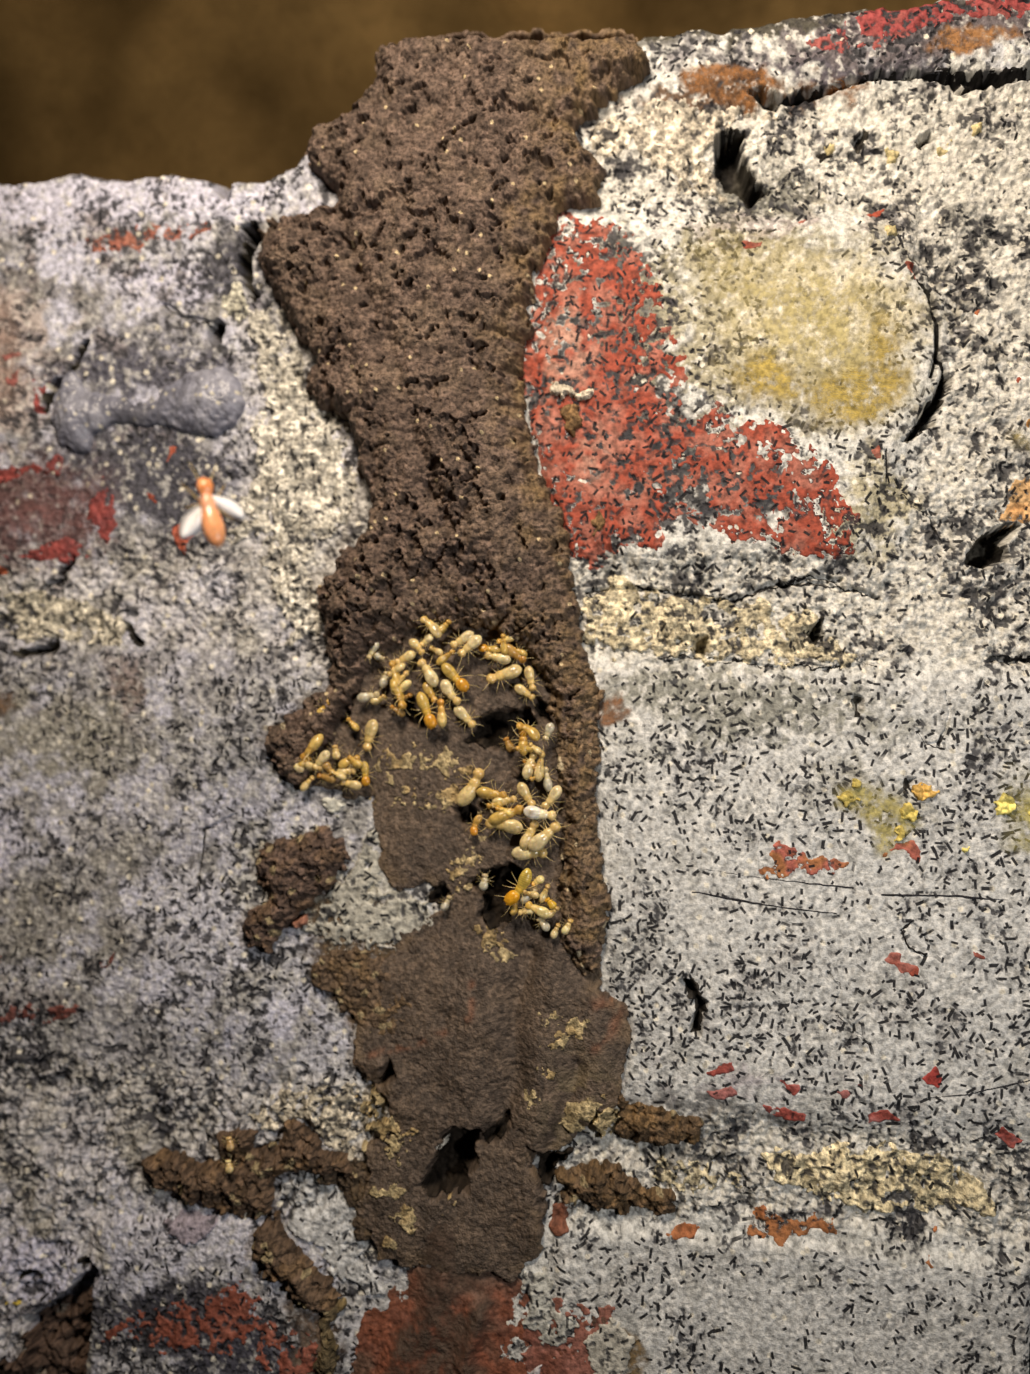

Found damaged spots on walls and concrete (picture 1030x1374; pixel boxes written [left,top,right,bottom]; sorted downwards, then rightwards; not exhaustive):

peeling [519,211,864,669]
crack [916,279,949,382]